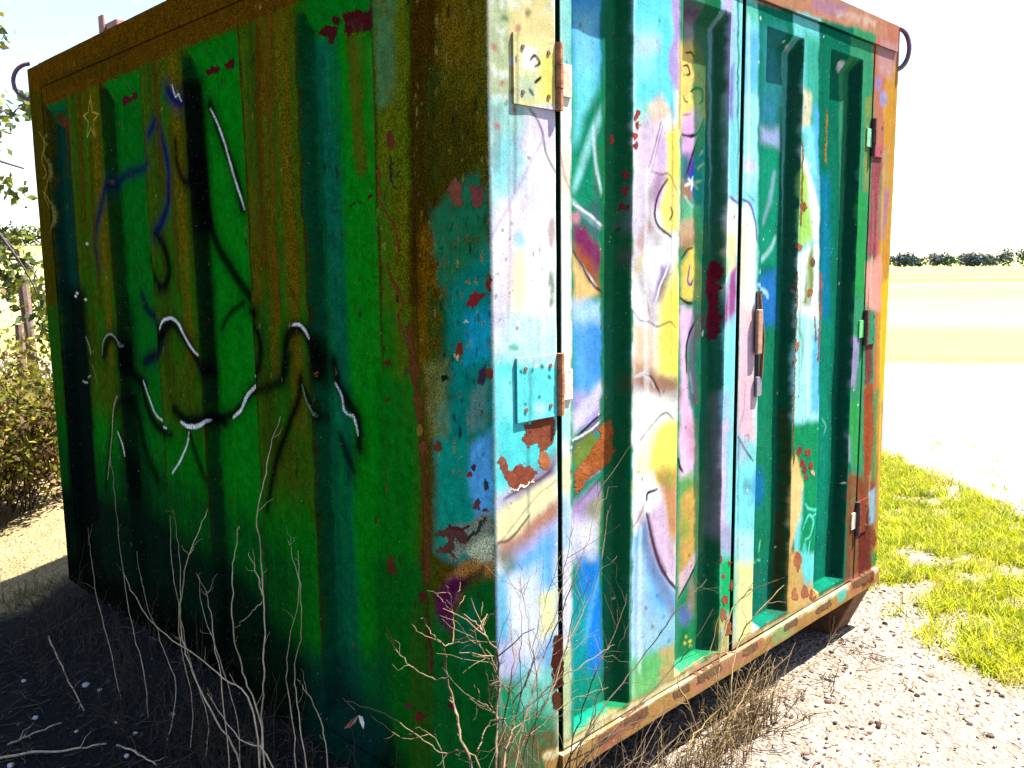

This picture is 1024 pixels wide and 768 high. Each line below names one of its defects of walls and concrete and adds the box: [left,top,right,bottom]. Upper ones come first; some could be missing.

peeling [497,416,555,492]
peeling [434,464,489,558]
rust [794,551,802,572]
rust [715,555,734,635]
rust [792,584,832,614]
rust [551,632,564,710]
rust [673,660,722,699]
rust [742,642,758,657]
rust [598,703,649,747]